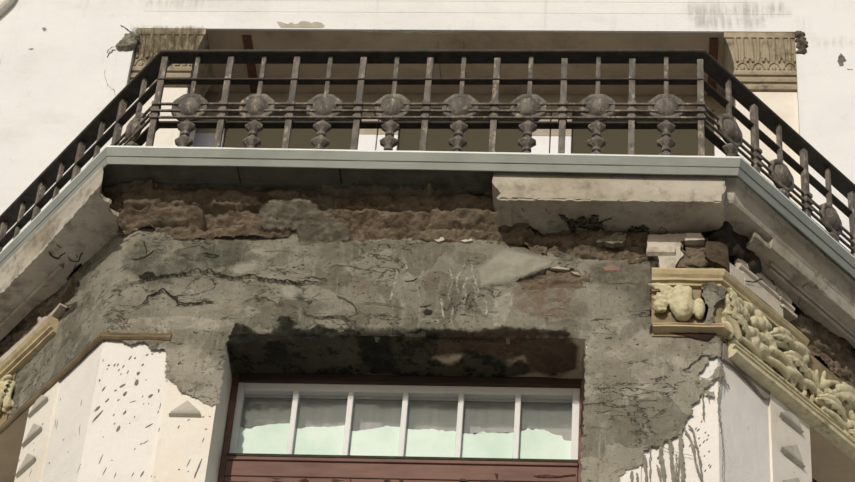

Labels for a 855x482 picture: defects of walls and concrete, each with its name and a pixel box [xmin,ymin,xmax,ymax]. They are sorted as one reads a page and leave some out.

crack [44,237,82,287]
crack [117,242,432,320]
water stain [282,286,297,299]
spalling [103,179,653,291]
water stain [227,293,578,378]
water stain [450,248,554,296]
spalling [670,282,725,340]
spalling [676,221,762,274]